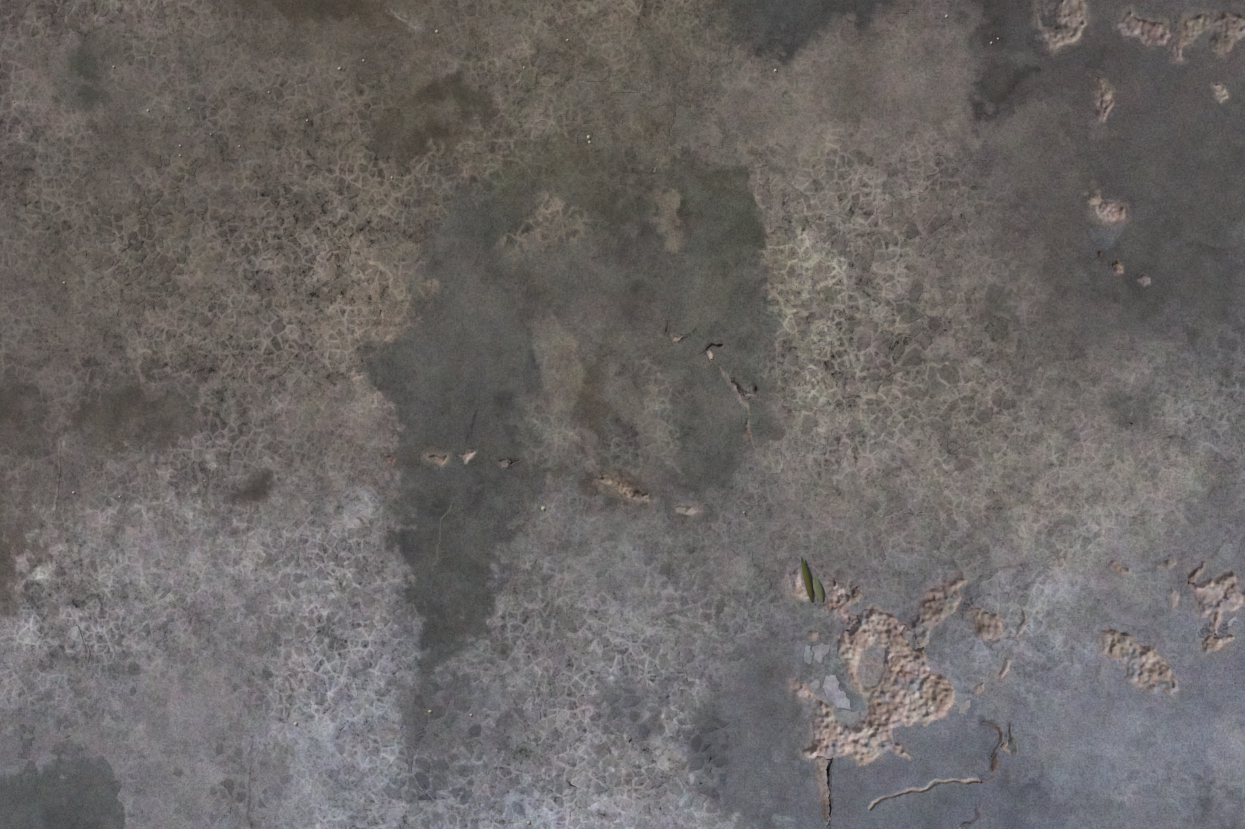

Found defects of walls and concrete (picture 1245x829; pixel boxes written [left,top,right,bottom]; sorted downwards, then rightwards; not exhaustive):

spalling [1027,0,1245,69]
spalling [1084,66,1124,135]
spalling [1209,80,1231,106]
spalling [1075,184,1133,232]
spalling [1095,249,1153,288]
water stain [598,357,677,465]
spalling [587,464,709,524]
spalling [1089,551,1245,705]
spalling [774,553,1037,776]